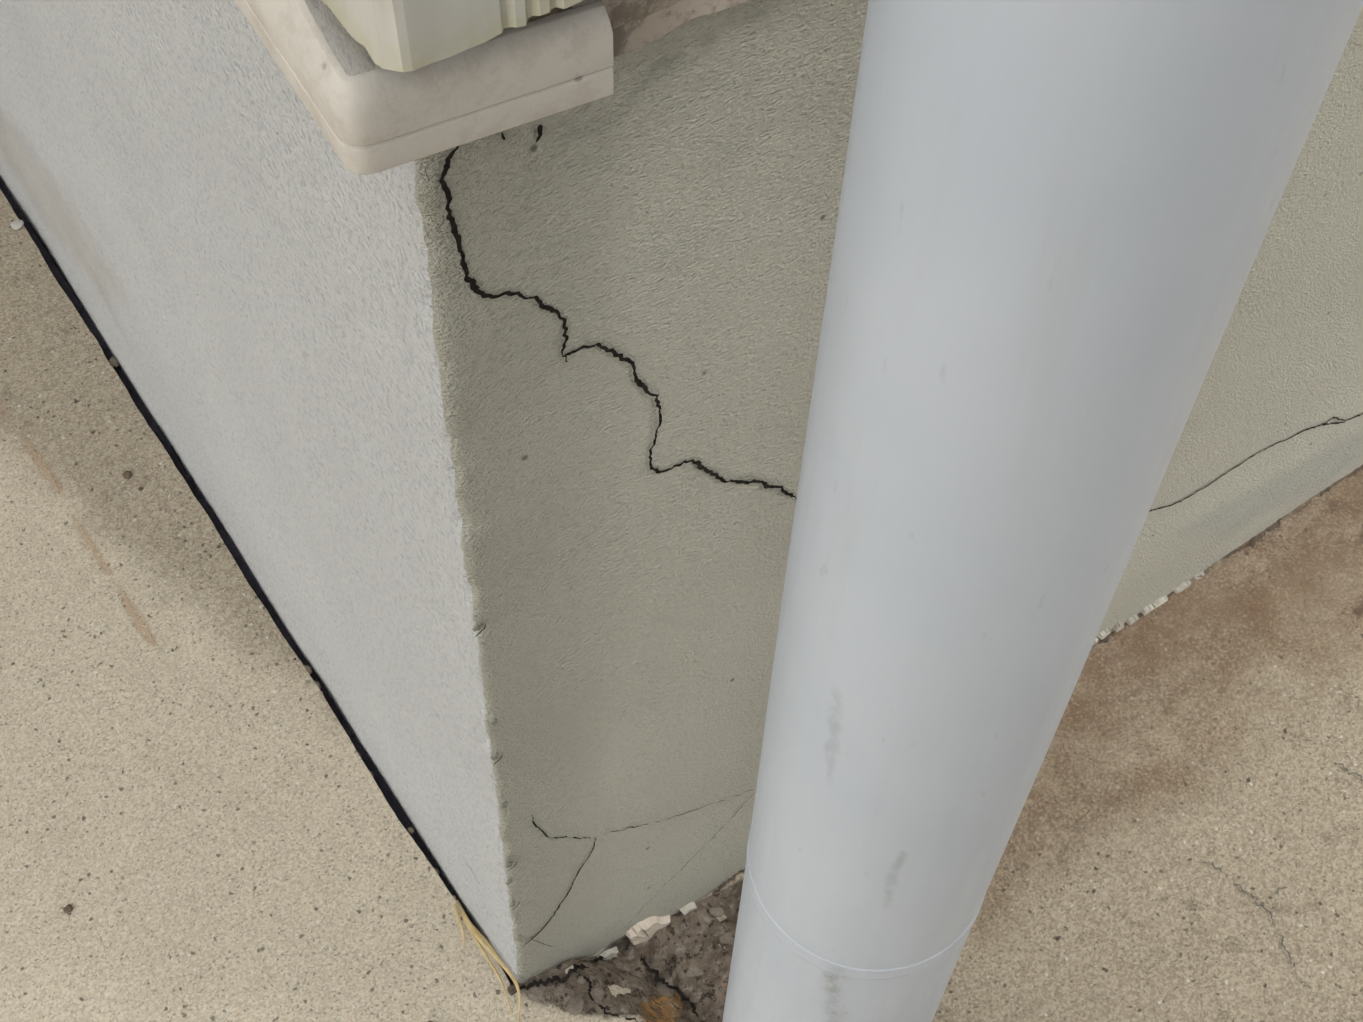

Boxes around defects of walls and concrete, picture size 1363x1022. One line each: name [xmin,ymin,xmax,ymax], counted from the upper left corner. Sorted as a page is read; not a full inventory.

crack [501,124,543,142]
crack [439,145,796,499]
crack [1149,413,1363,512]
crack [1092,465,1363,647]
spalling [507,879,743,1022]
crack [519,789,754,1022]